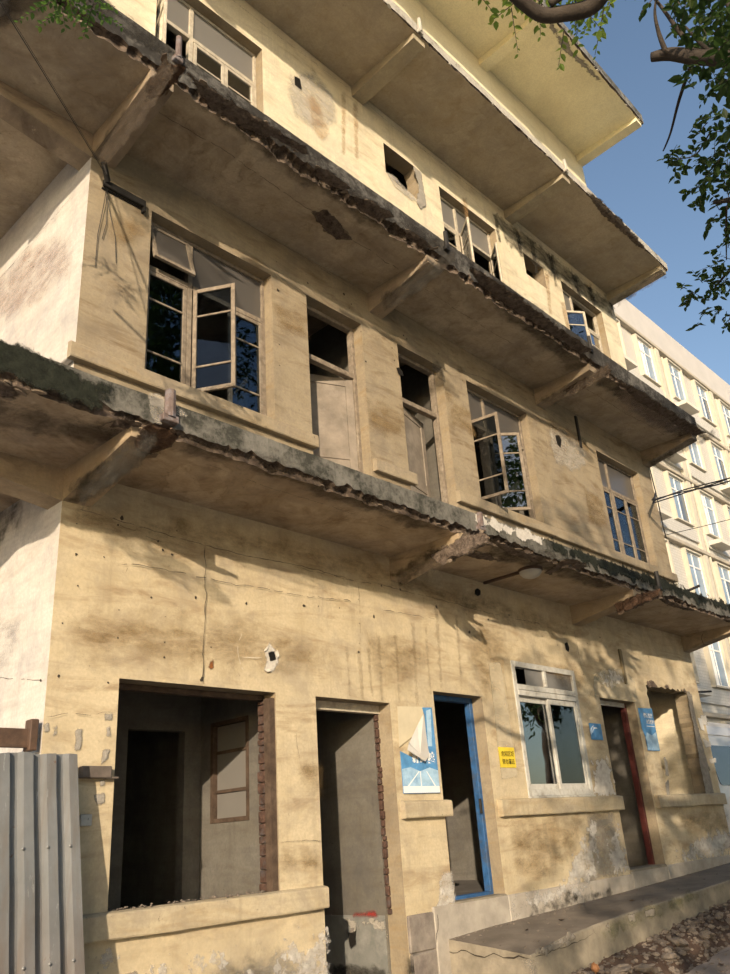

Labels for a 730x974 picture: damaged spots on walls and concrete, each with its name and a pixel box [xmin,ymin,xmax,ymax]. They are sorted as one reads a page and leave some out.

spalling [43,0,707,436]
water stain [495,217,660,316]
water stain [61,424,119,442]
water stain [73,433,156,502]
spalling [0,370,730,623]
crack [80,509,532,683]
peeling [590,756,616,796]
flaking render [437,873,455,906]